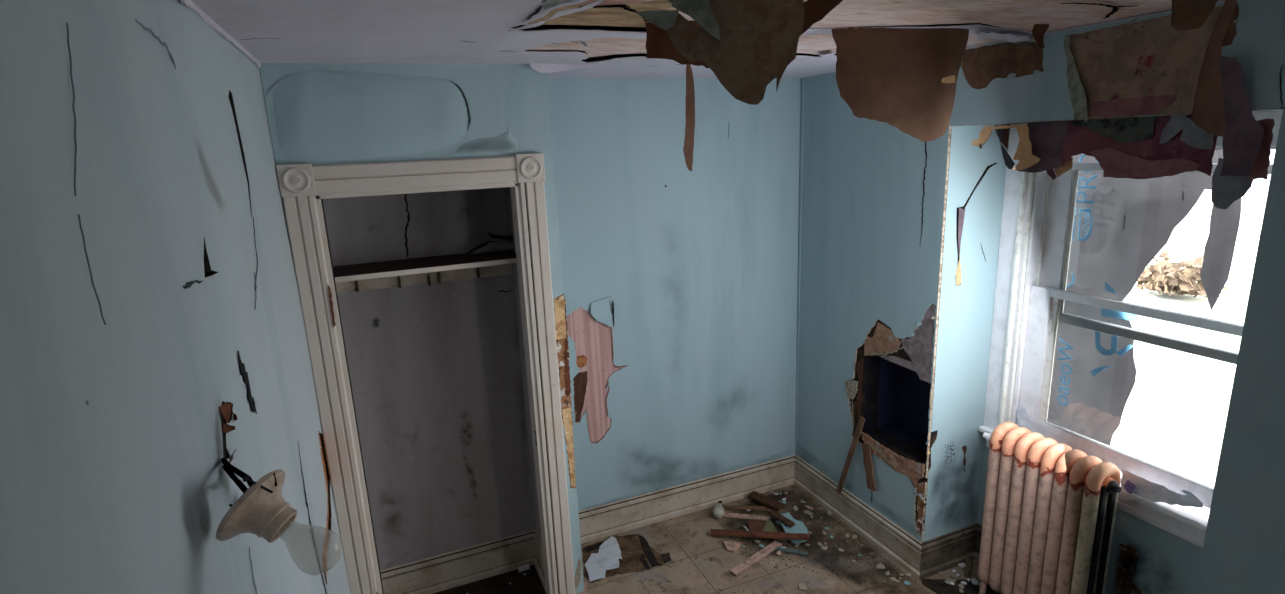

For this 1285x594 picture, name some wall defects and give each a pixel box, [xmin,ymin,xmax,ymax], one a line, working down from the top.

crack [135,19,176,69]
crack [1277,63,1285,110]
peeling [971,125,992,149]
crack [66,23,106,325]
crack [403,194,411,259]
crack [182,280,203,289]
crack [251,217,259,310]
crack [238,351,257,414]
peeling [554,293,628,488]
spalling [845,304,937,534]